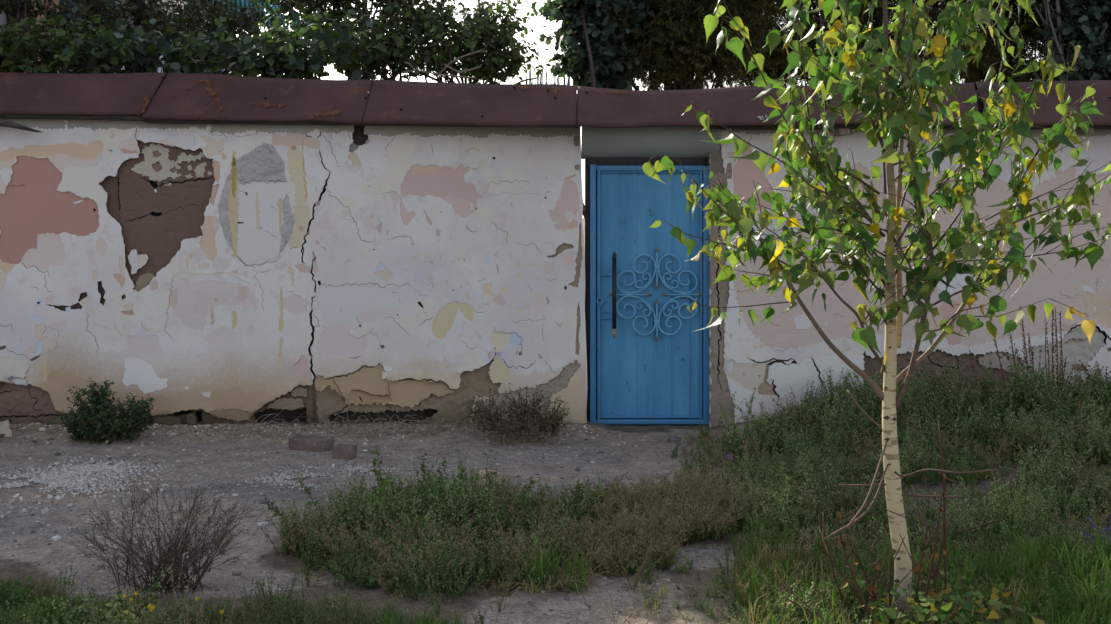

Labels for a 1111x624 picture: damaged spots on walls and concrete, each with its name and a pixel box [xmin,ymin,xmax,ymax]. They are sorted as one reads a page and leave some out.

spalling [0,382,71,422]
spalling [0,135,229,315]
crack [98,127,256,221]
peeling [143,303,581,425]
crack [237,134,560,416]
peeling [400,163,486,242]
peeling [432,165,583,340]
peeling [709,142,1111,427]